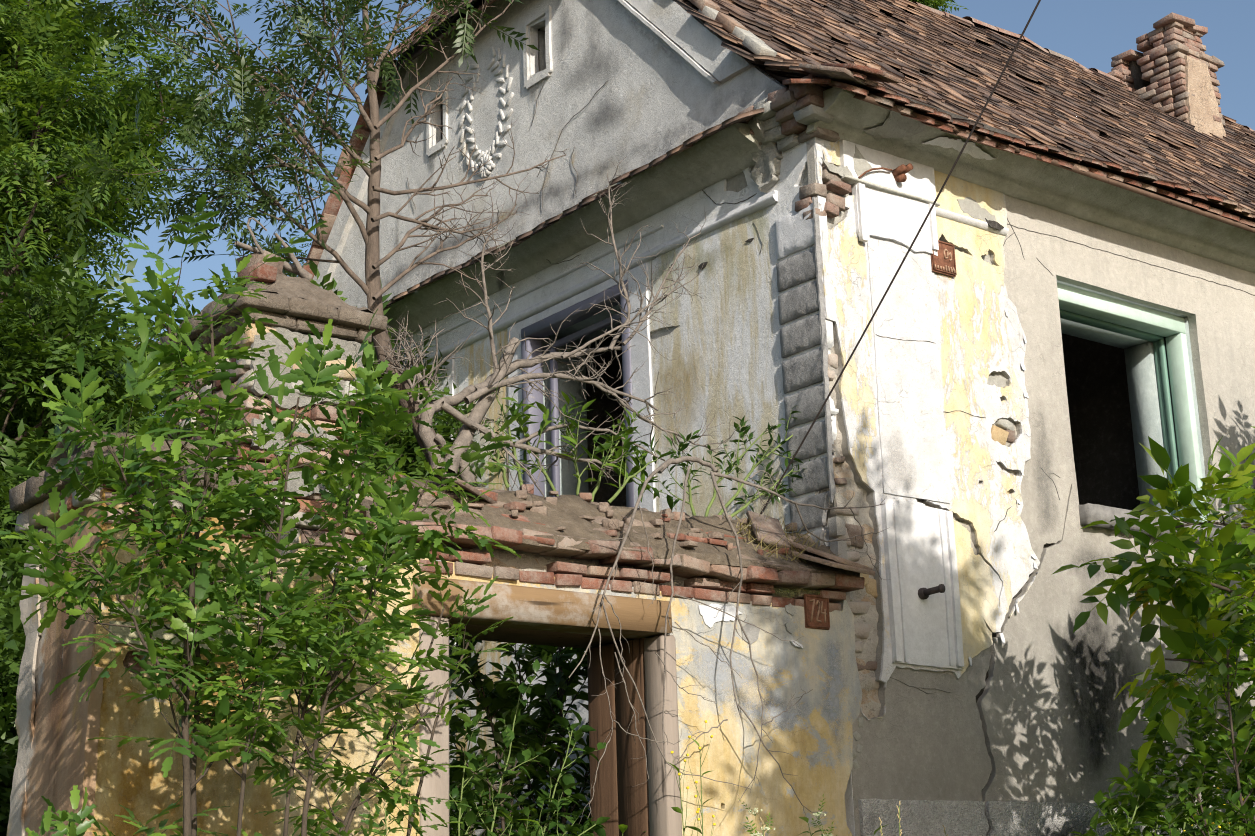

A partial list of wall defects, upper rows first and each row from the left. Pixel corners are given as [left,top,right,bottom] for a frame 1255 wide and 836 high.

peeling [957,197,1004,230]
flaking render [987,372,1007,387]
flaking render [991,418,1029,446]
flaking render [819,347,881,719]
flaking render [953,516,977,555]
peeling [698,603,760,644]
crack [890,544,1051,703]